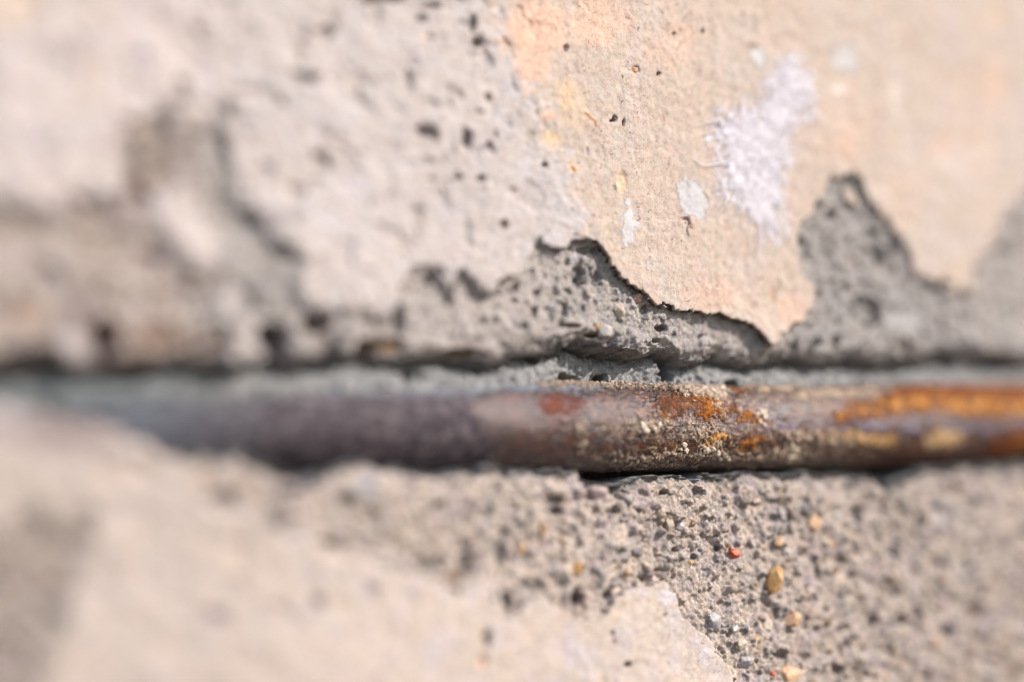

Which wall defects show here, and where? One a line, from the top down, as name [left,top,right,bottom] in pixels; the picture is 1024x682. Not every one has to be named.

leakage [676,48,821,257]
spalling [0,91,1024,370]
rust [541,392,588,424]
rust [633,384,774,460]
rust [796,382,1024,463]